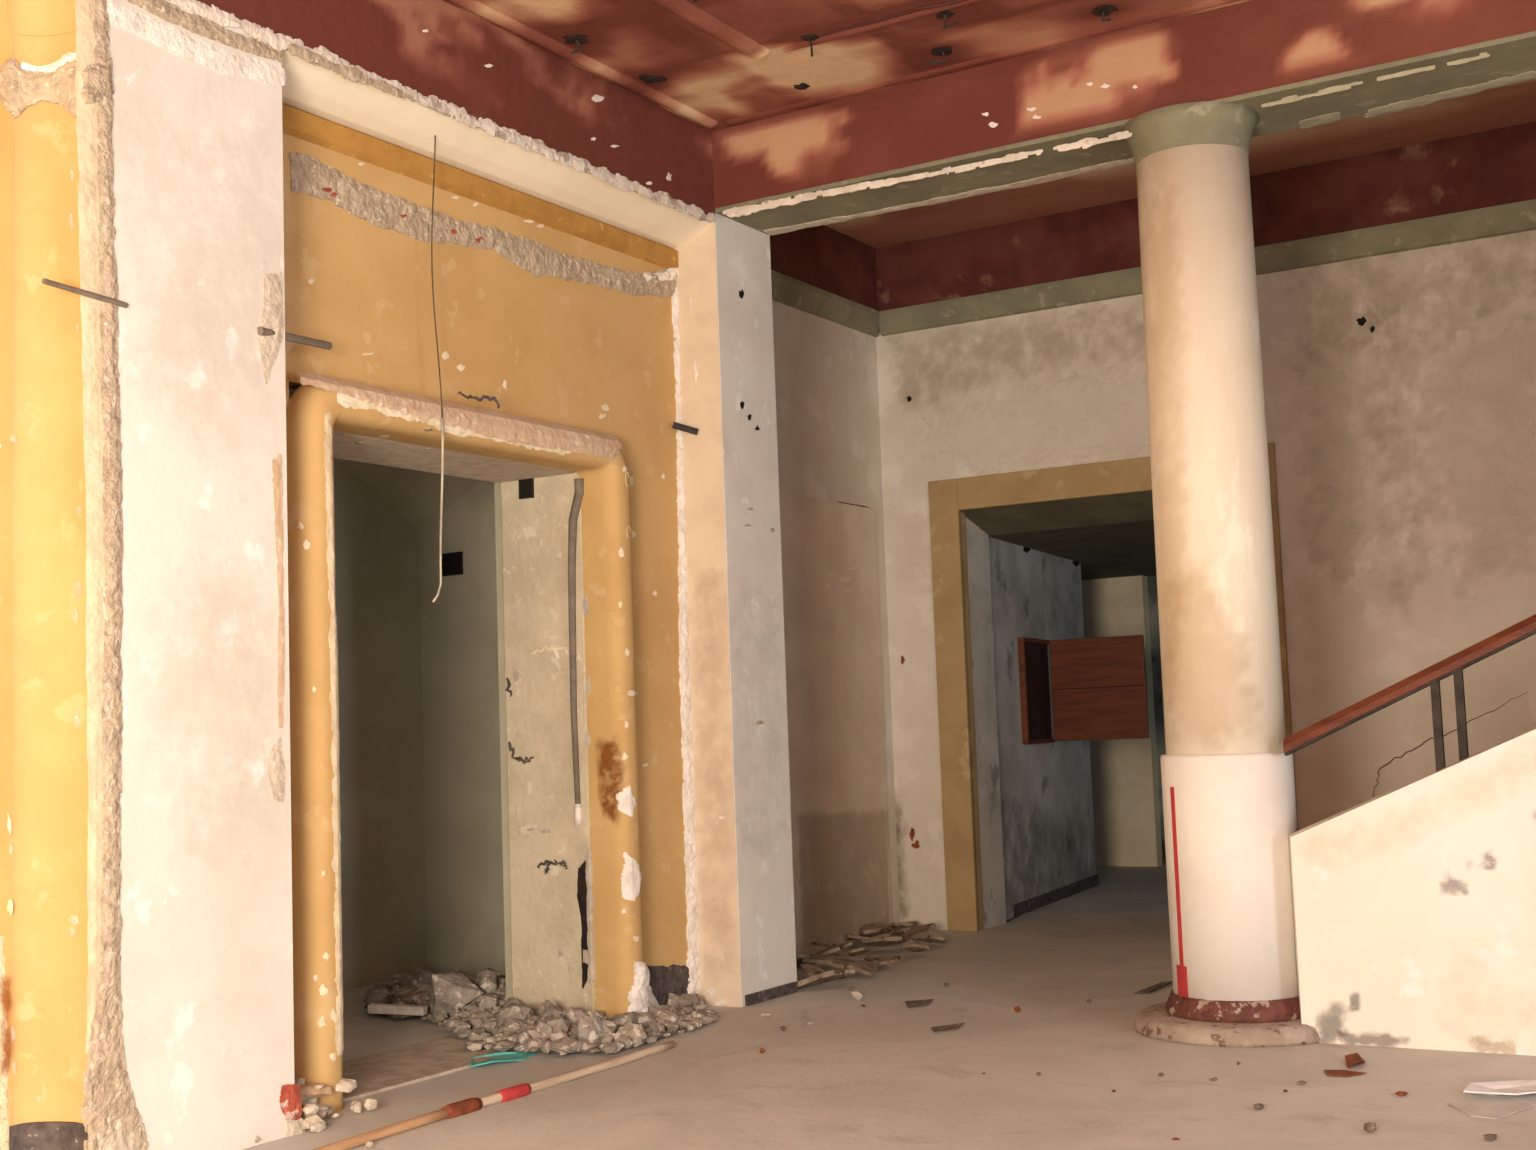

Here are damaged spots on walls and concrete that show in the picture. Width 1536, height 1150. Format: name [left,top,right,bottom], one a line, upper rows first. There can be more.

flaking render [106,0,285,86]
crack [821,0,967,36]
corrosion [599,743,622,819]
peeling [68,915,79,936]
spalling [0,935,17,1150]